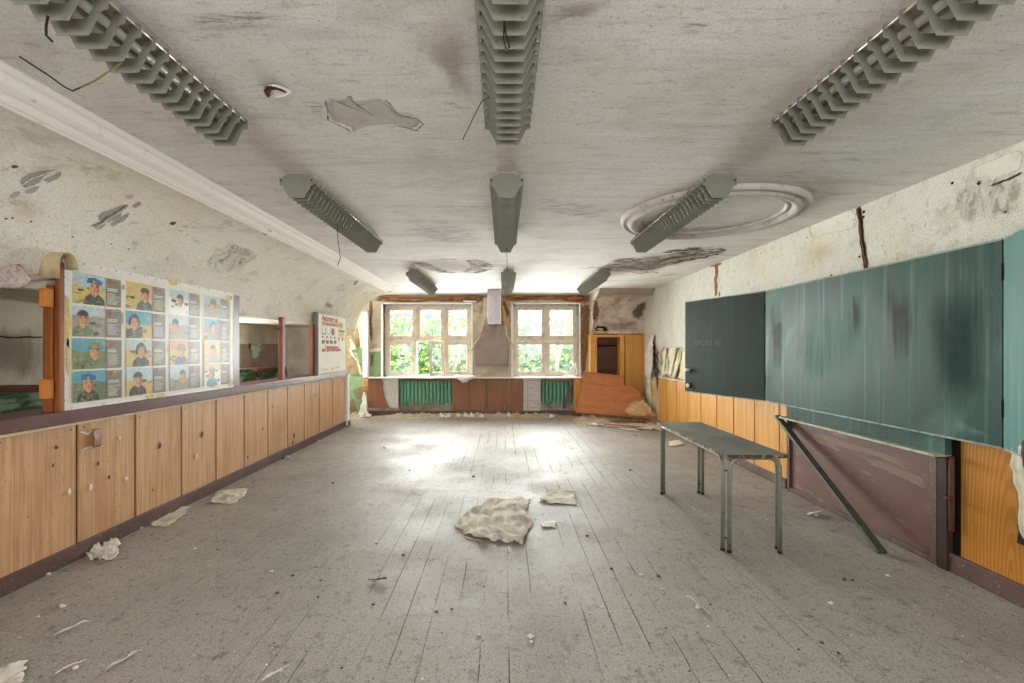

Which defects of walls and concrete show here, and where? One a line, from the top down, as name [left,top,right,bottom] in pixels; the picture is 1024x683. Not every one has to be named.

flaking render [325,96,424,132]
peeling [10,165,61,198]
peeling [95,202,141,230]
corrosion [709,263,721,296]